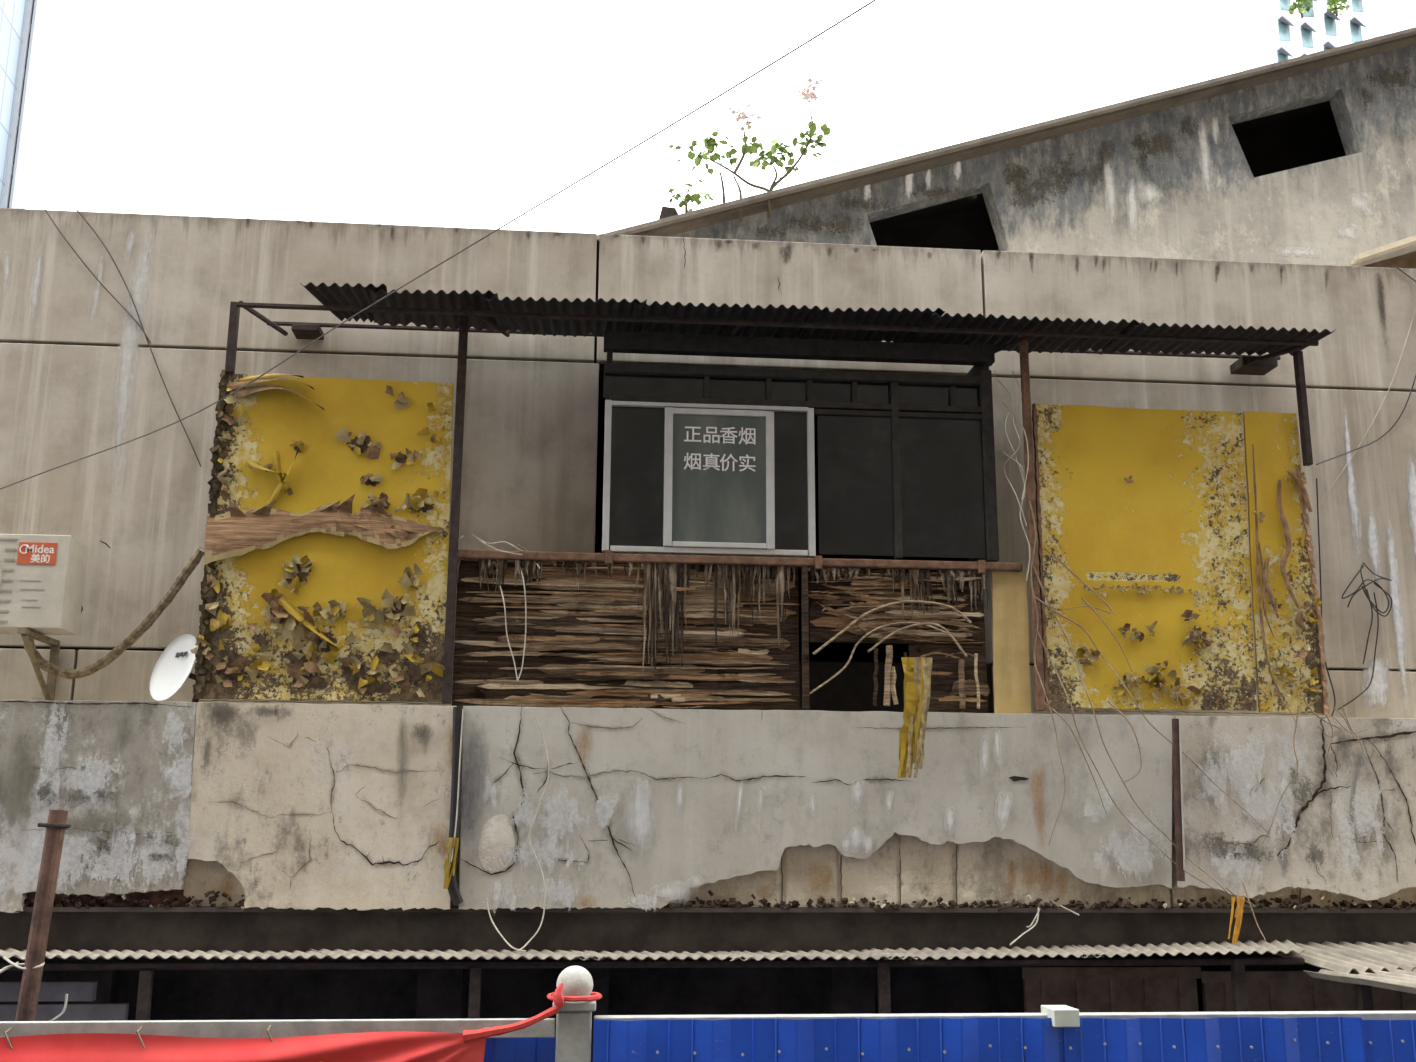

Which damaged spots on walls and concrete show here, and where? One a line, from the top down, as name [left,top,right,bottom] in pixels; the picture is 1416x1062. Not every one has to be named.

damp [1358,60,1413,111]
damp [1002,117,1218,231]
peeling [335,385,445,528]
spalling [190,552,445,697]
peeling [1083,518,1248,706]
damp [0,741,112,853]
peeling [22,704,246,910]
damp [146,832,179,860]
crack [209,707,913,906]
crack [856,724,1011,732]
spalling [623,730,1416,911]
damp [1350,754,1365,842]